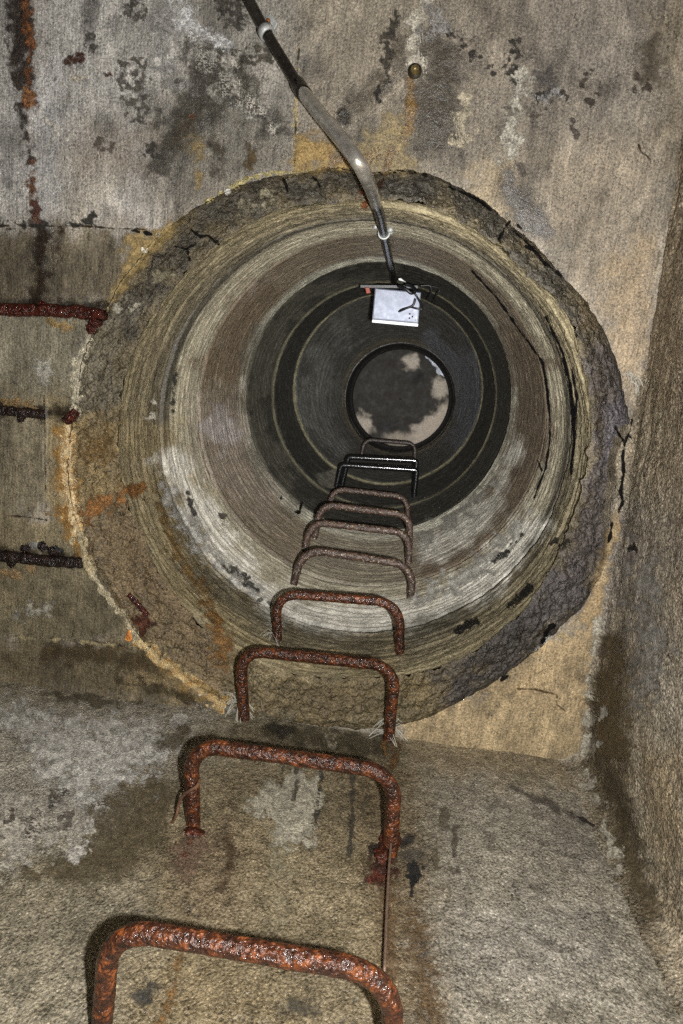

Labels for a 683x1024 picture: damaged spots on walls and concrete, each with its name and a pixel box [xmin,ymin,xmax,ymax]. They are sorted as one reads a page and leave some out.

rust [5,0,63,304]
leakage [146,0,351,223]
crack [175,229,220,261]
leakage [0,334,232,883]
rust [78,482,235,672]
leakage [158,481,264,597]
crack [607,419,633,543]
leakage [264,722,385,757]
rust [218,835,236,893]
leakage [242,764,325,882]
rust [132,956,182,1024]
rust [364,843,445,1024]